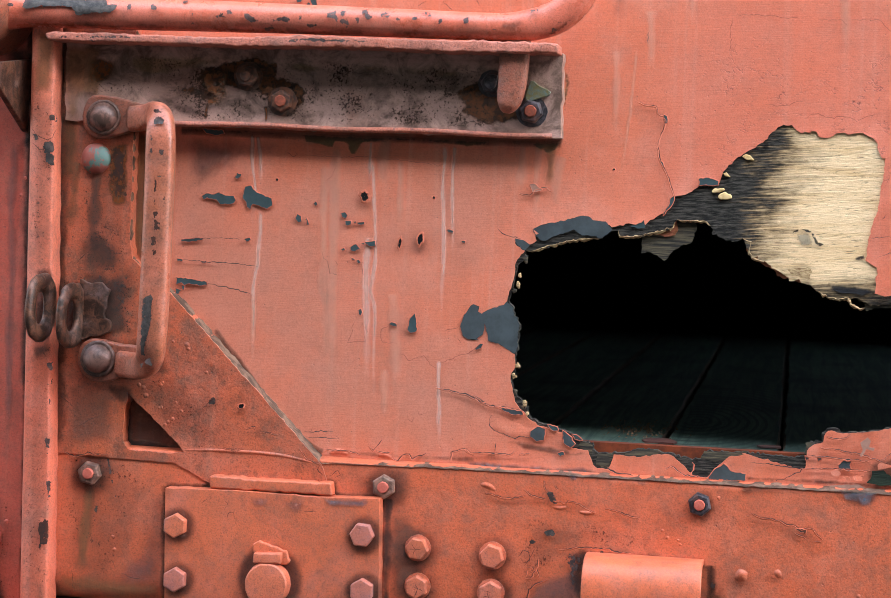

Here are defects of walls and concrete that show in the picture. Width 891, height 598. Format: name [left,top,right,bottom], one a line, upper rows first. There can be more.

peeling [7,0,132,16]
peeling [265,16,367,42]
peeling [327,9,401,28]
corrosion [182,58,305,121]
corrosion [457,83,517,125]
peeling [201,173,273,210]
peeling [515,216,612,251]
peeling [875,286,891,296]
peeling [460,302,520,353]
peeling [529,424,583,457]
peeling [708,463,746,482]
peeling [828,438,891,489]